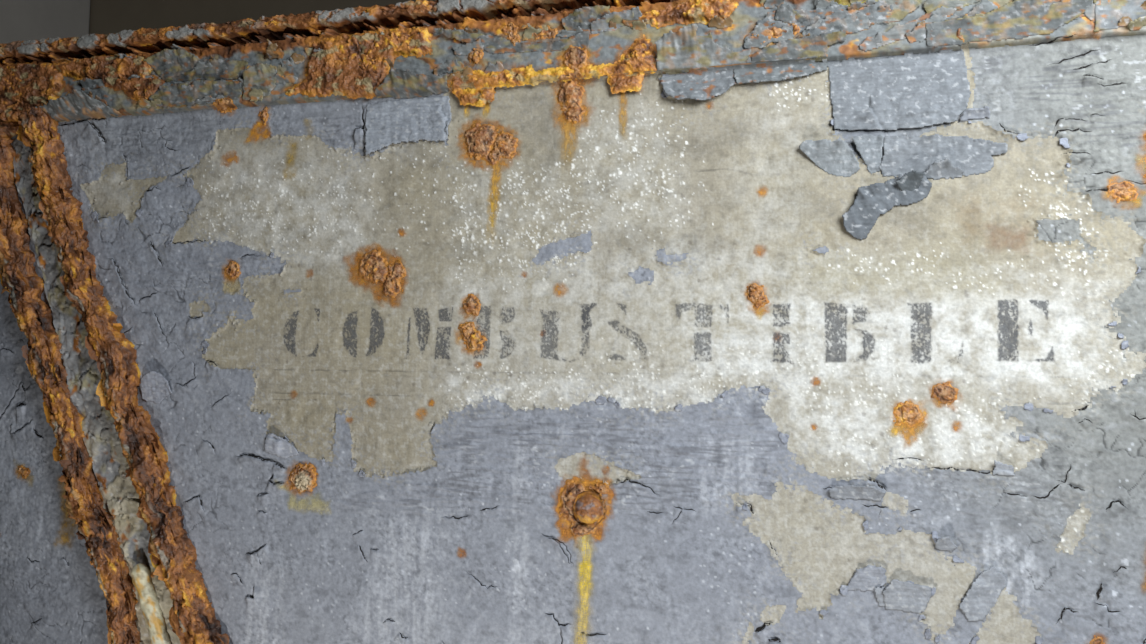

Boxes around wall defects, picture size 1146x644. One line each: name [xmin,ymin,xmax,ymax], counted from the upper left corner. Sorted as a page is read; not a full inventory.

rust [0,53,165,138]
rust [284,26,433,99]
rust [449,0,739,134]
crack [1031,33,1123,86]
crack [1055,113,1146,191]
peeling [164,0,1146,486]
crack [202,439,287,513]
crack [864,457,1085,515]
crack [546,613,606,644]
peeling [731,482,1043,644]
peeling [1055,504,1091,555]
crack [1056,566,1127,624]